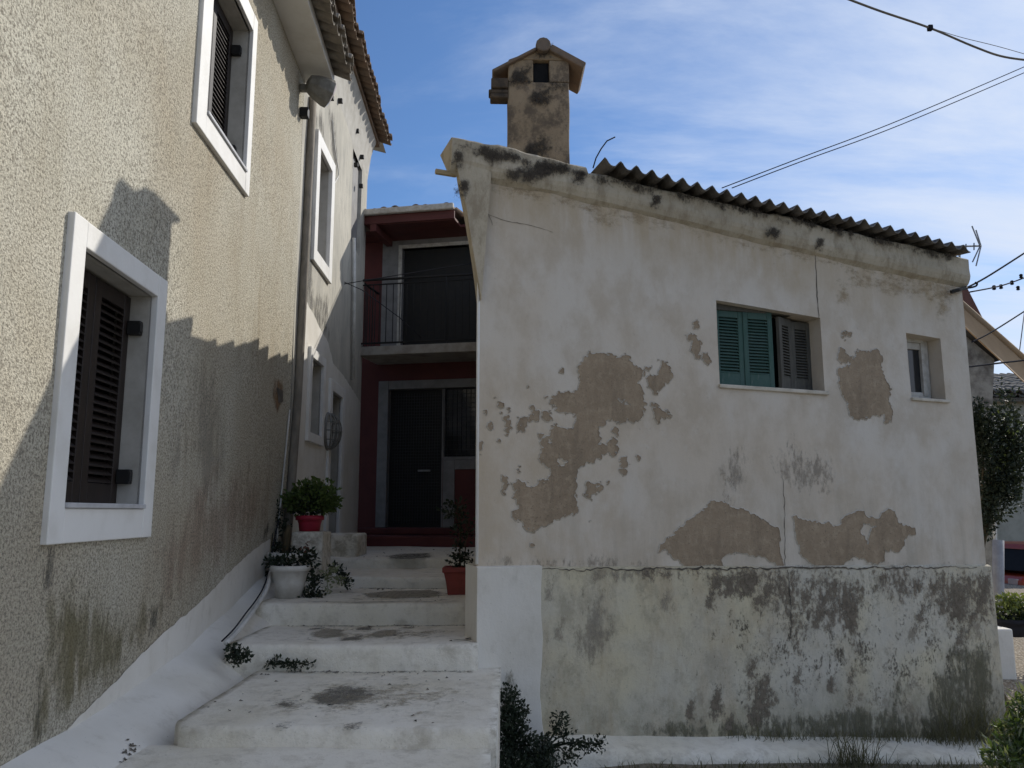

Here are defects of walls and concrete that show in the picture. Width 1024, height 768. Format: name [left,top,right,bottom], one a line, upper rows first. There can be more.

damp [531,81,567,106]
damp [509,138,595,185]
peeling [685,319,712,366]
peeling [836,330,894,425]
peeling [475,350,674,548]
peeling [657,499,785,566]
crack [543,478,977,641]
peeling [792,508,916,566]
damp [642,566,995,738]